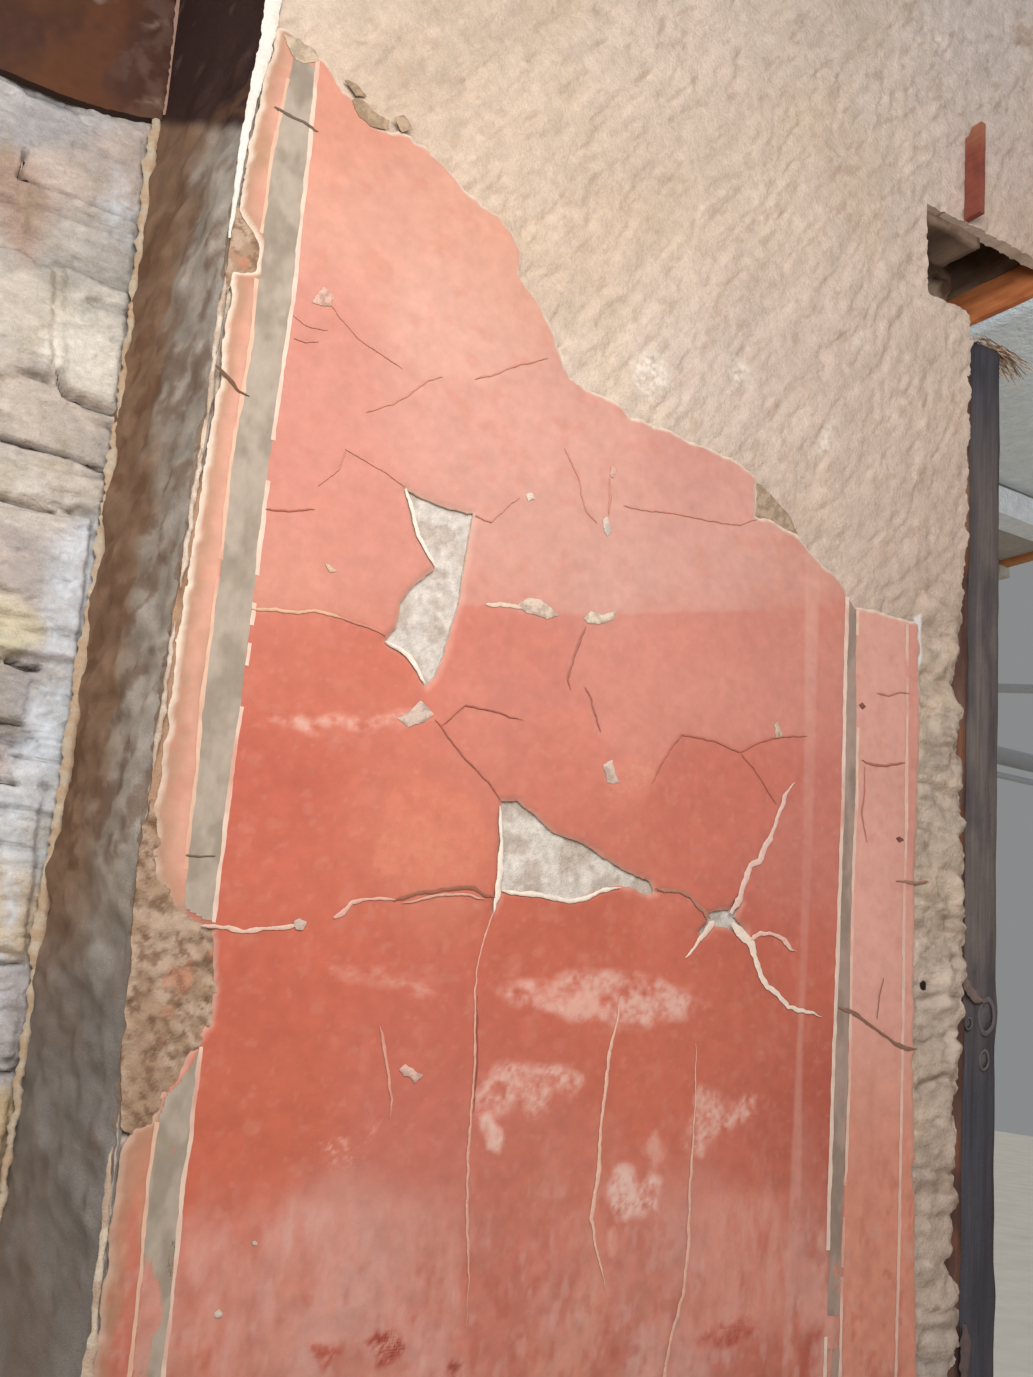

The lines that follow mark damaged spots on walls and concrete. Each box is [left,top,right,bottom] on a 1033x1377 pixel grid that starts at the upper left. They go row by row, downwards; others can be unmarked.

crack [215,365,249,396]
flaking render [755,483,798,535]
flaking render [385,489,472,727]
flaking render [120,472,217,1134]
flaking render [494,801,653,912]
crack [652,734,917,1051]
water stain [507,971,690,1025]
crack [201,886,497,1326]
water stain [476,1064,581,1150]
crack [589,997,621,1291]
water stain [608,1133,661,1220]
water stain [694,1088,753,1157]